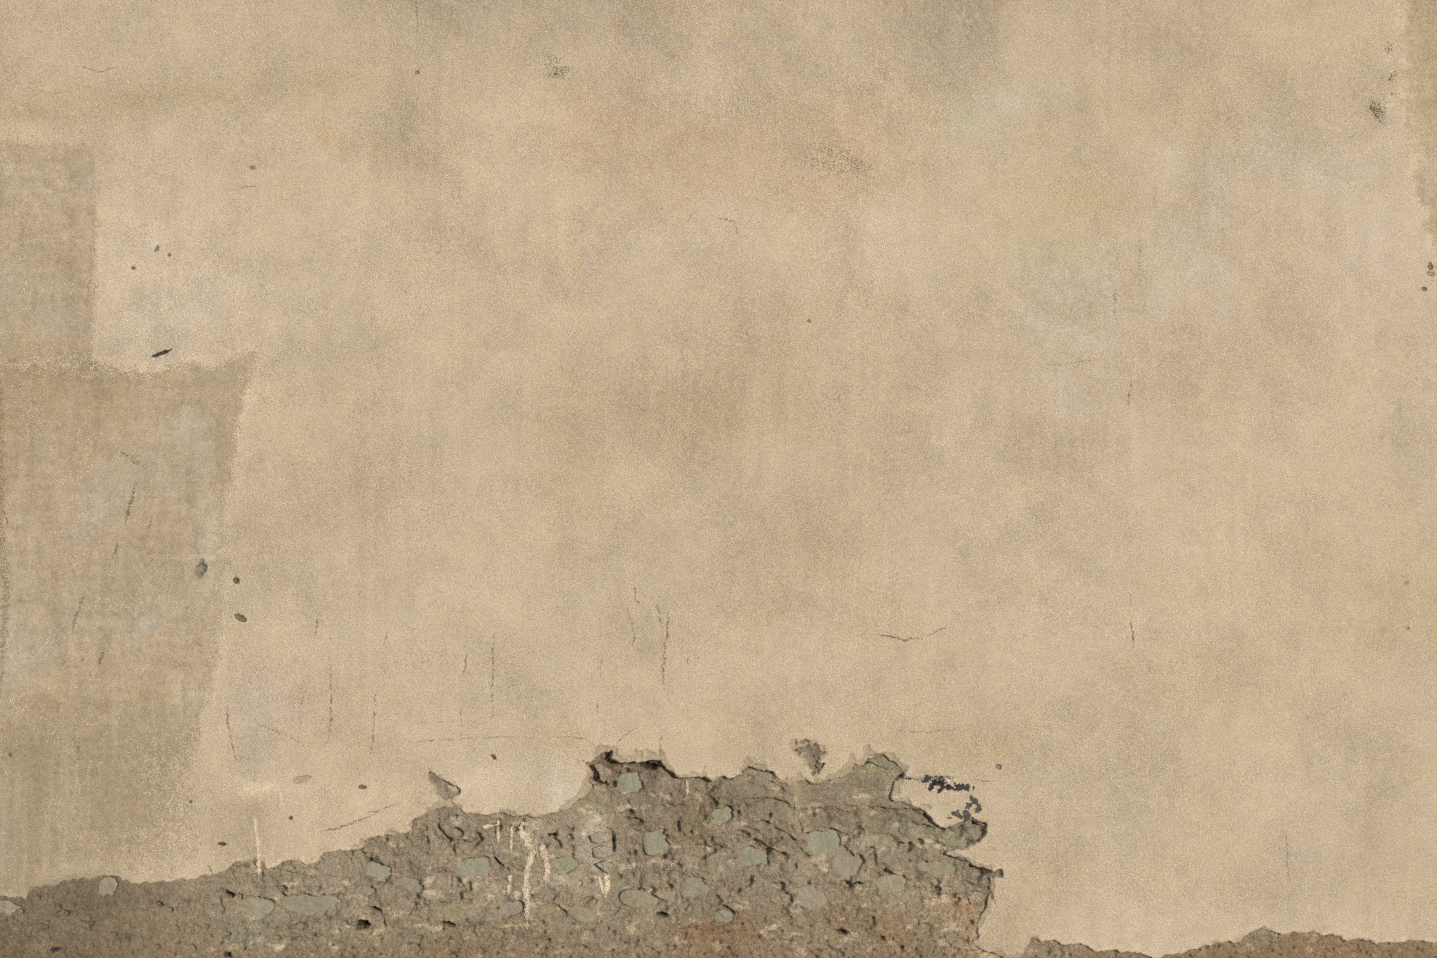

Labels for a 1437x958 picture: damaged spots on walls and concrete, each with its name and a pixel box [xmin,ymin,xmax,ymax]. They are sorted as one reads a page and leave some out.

leakage [0,368,11,713]
spalling [0,138,1002,958]
spalling [1020,928,1437,958]